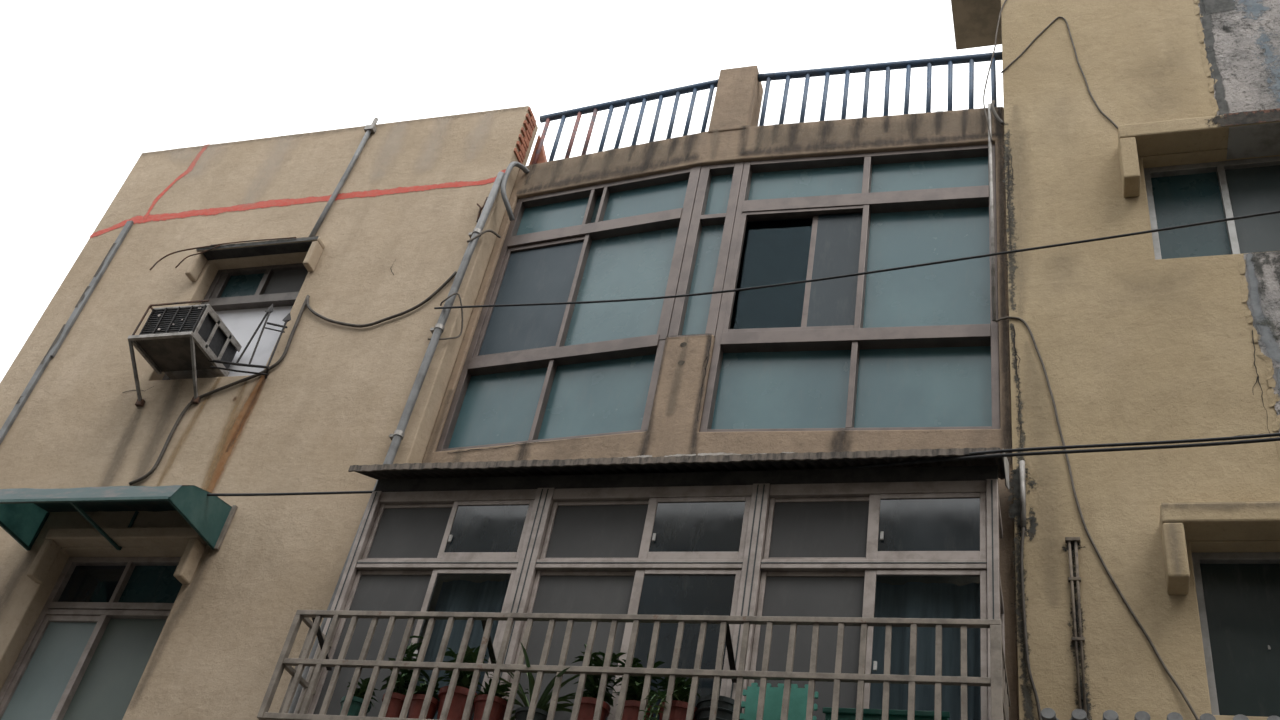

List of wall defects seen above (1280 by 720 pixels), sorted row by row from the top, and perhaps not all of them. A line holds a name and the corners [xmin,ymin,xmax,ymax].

peeling [1193,0,1280,127]
rust [202,375,265,493]
damp [740,106,1039,720]
crack [1237,330,1270,436]
peeling [1238,252,1280,459]